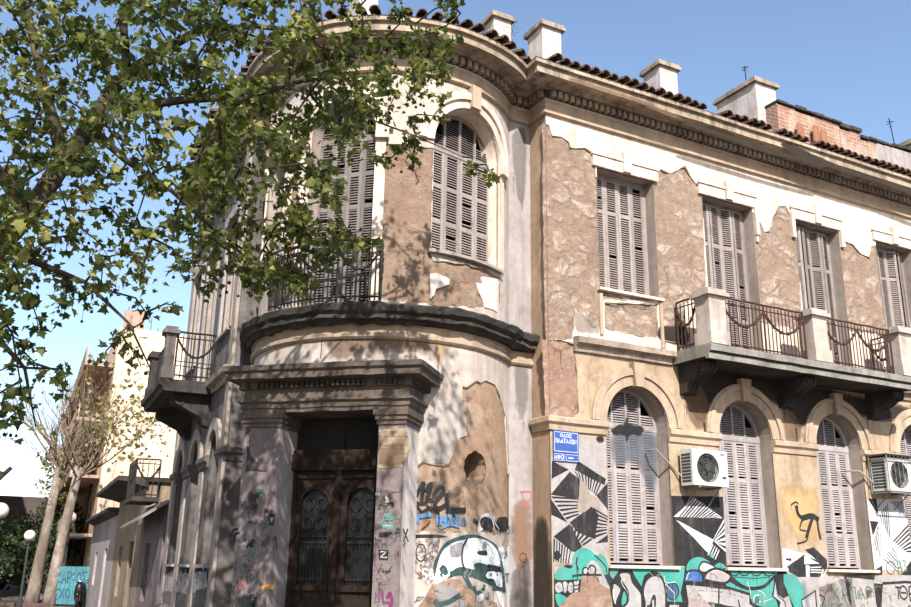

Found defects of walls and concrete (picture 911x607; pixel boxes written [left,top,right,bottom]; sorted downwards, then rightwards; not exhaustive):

peeling [382,144,500,312]
peeling [541,124,705,418]
peeling [752,206,801,329]
peeling [832,229,885,333]
peeling [416,380,510,534]
flaking render [418,579,498,607]